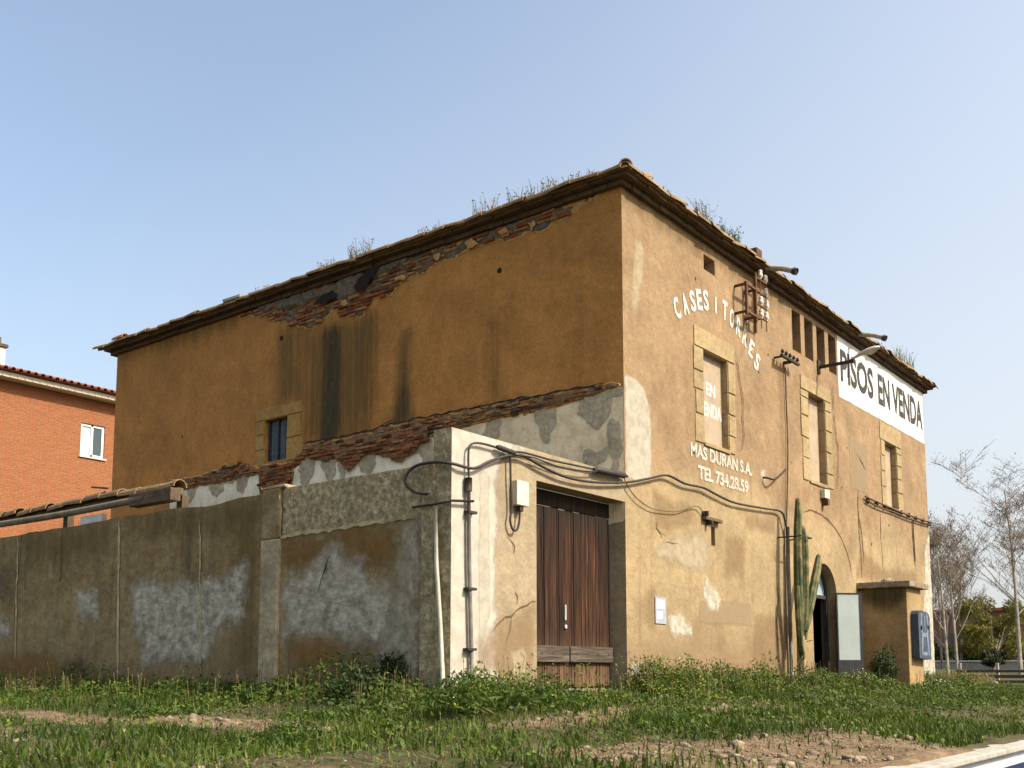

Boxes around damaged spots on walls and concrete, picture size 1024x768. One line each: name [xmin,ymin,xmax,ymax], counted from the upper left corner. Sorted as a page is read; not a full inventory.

spalling [238,194,602,330]
water stain [310,324,366,442]
peeling [169,382,624,509]
water stain [395,374,408,423]
peeling [536,487,625,525]
crack [493,592,536,663]